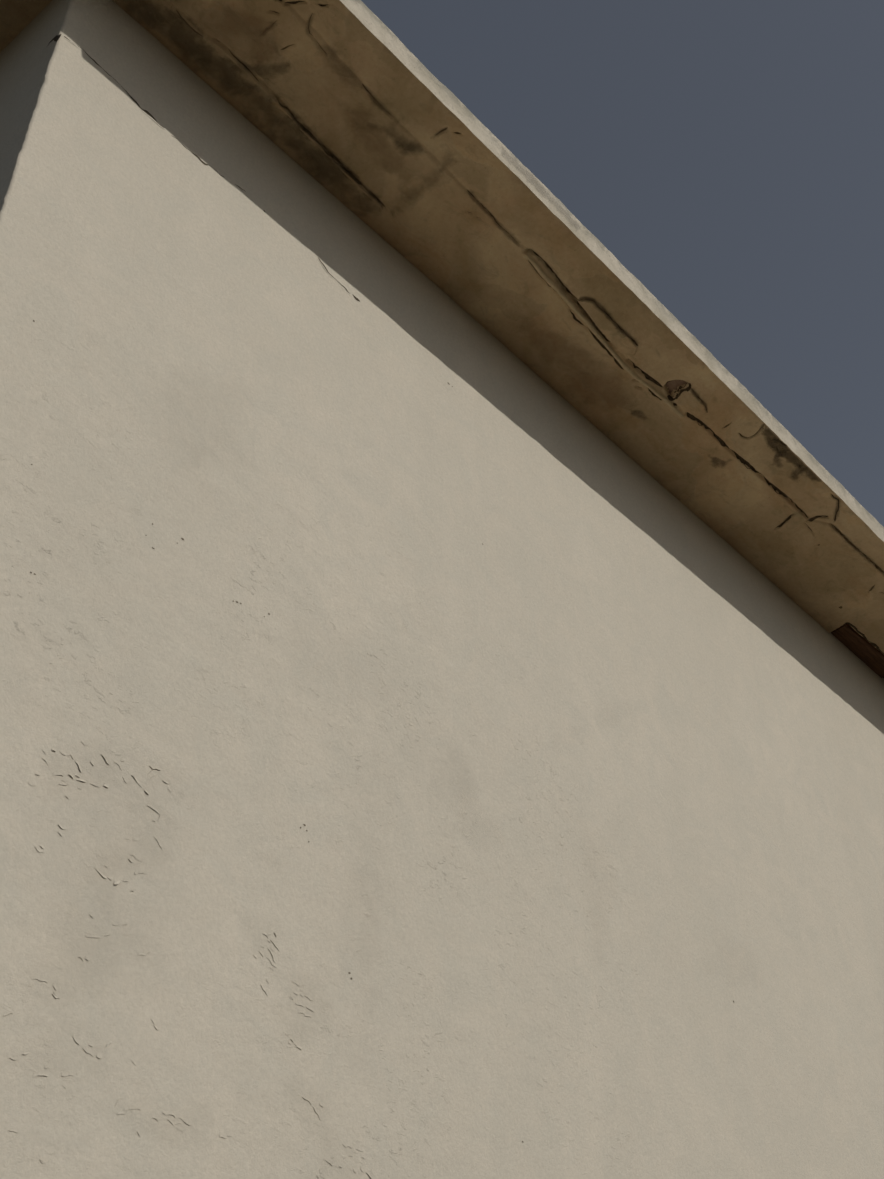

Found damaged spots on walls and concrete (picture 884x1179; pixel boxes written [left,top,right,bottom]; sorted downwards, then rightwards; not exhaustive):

crack [48,34,243,190]
crack [318,259,360,301]
crack [467,190,884,593]
spalling [664,380,707,417]
leakage [764,430,818,480]